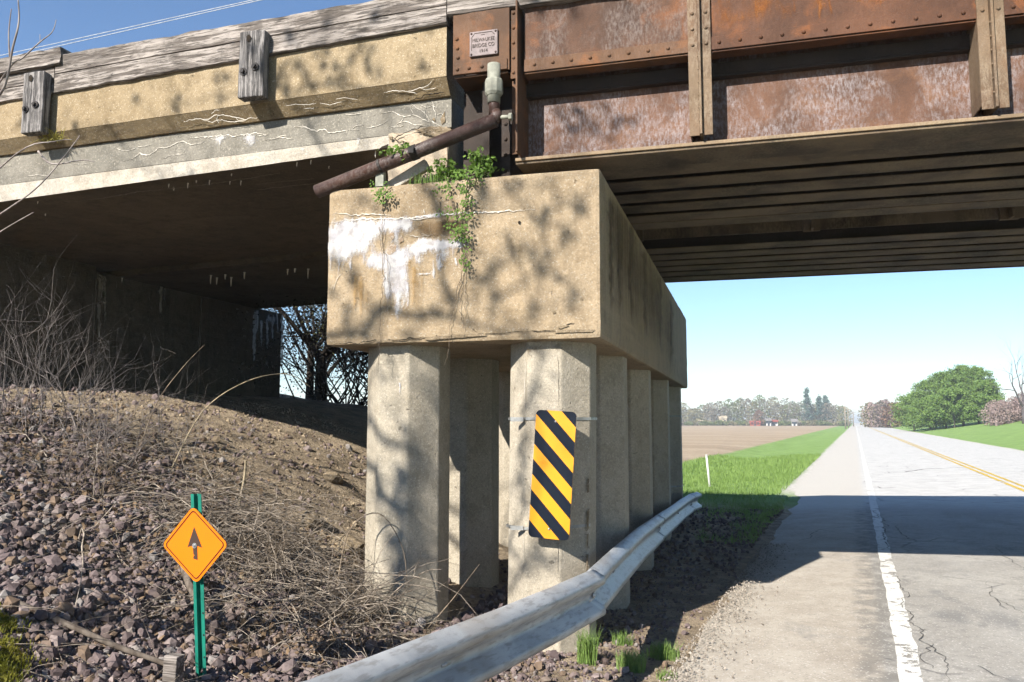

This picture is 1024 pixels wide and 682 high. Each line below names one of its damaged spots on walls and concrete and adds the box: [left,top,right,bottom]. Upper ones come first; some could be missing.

crack [116,81,444,161]
crack [332,206,535,238]
water stain [328,213,468,313]